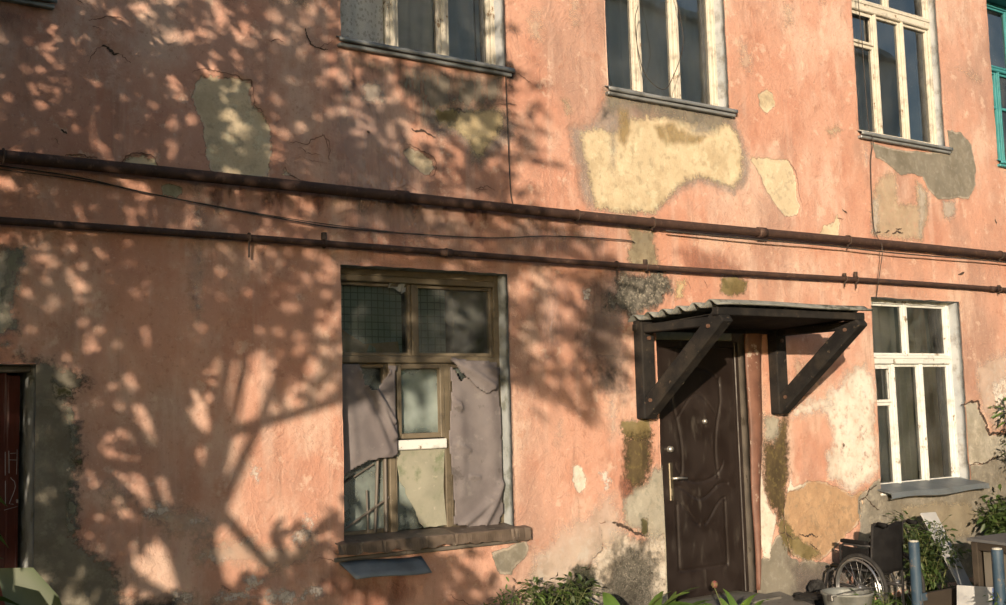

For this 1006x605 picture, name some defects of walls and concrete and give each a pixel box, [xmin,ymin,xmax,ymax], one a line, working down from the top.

crack [78,0,131,63]
peeling [191,68,272,177]
peeling [403,144,437,175]
spalling [434,103,516,157]
spalling [580,90,802,217]
water stain [582,228,691,389]
water stain [694,253,748,296]
peeling [572,465,587,493]
water stain [620,419,653,497]
water stain [763,414,794,555]
spalling [761,358,1006,593]
water stain [796,568,848,593]